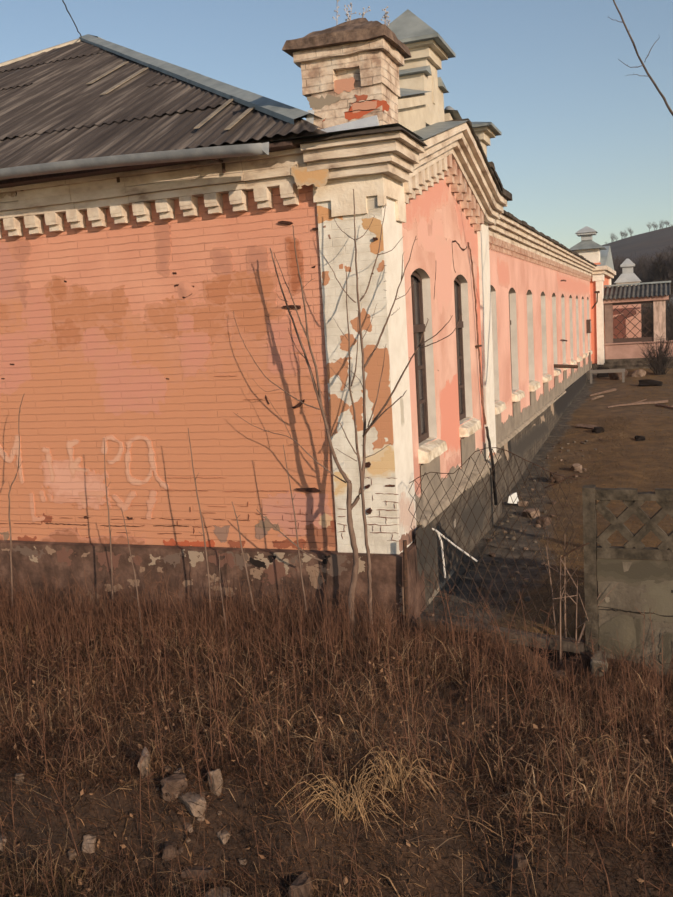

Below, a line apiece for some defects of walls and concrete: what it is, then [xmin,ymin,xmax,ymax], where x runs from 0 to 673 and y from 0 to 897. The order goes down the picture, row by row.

spalling [334,77,390,120]
damp [152,220,171,277]
peeling [317,206,343,239]
peeling [312,264,351,286]
peeling [362,217,385,274]
damp [0,236,350,551]
peeling [327,308,394,450]
spalling [0,516,365,597]
crack [599,609,673,617]